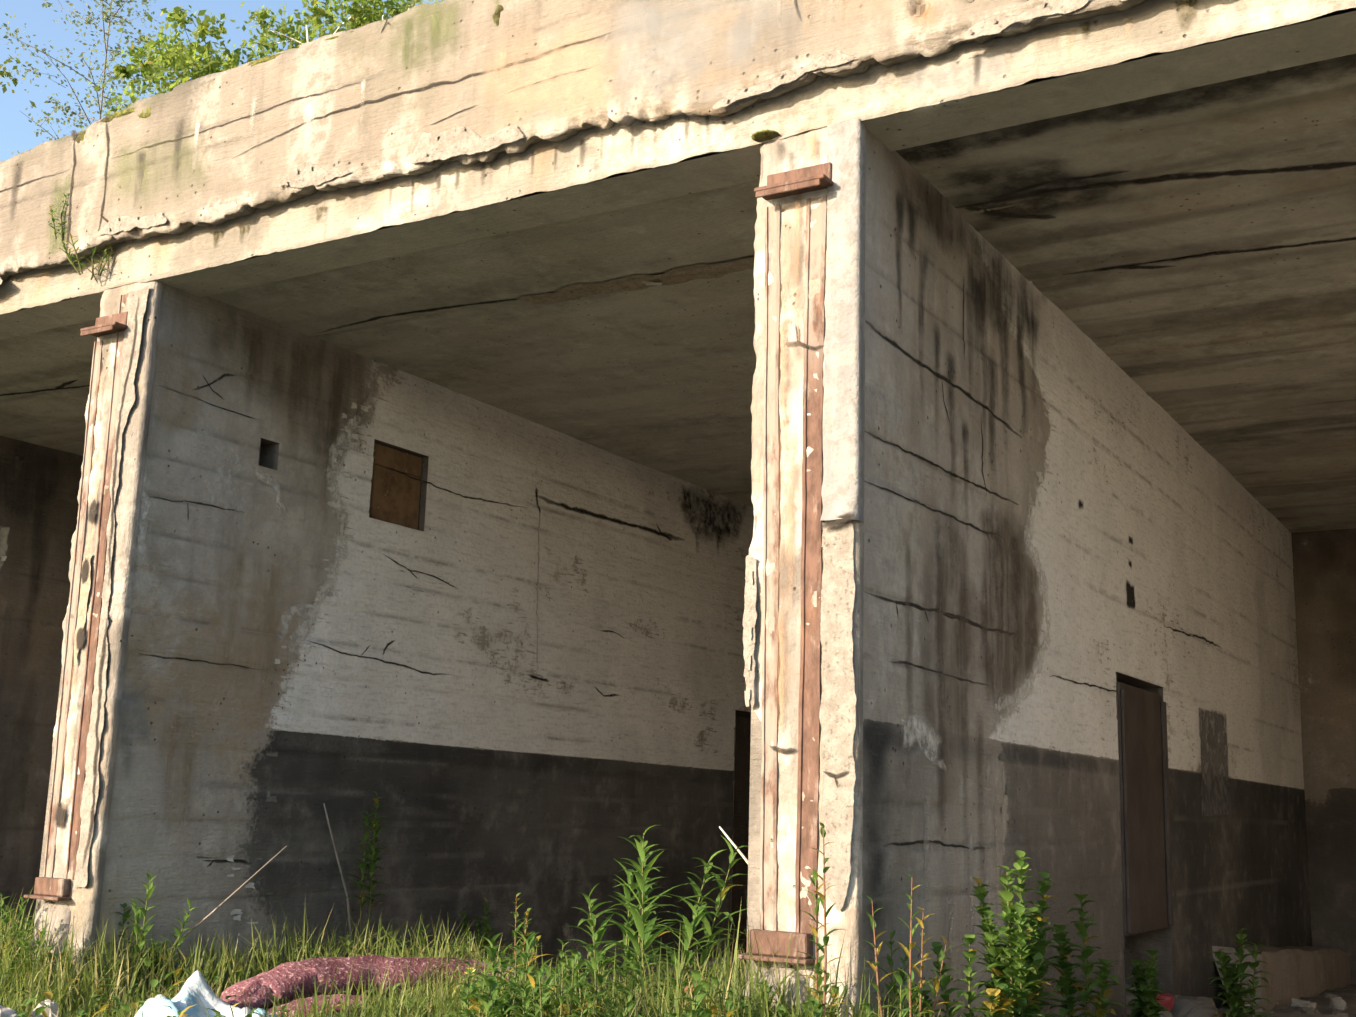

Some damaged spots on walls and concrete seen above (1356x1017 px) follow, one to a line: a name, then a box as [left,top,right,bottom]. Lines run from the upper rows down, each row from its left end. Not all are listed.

spalling [948,0,1089,41]
crack [0,38,595,249]
damp [900,139,965,163]
damp [959,163,1113,220]
damp [982,54,1356,145]
damp [975,257,1034,440]
crack [865,285,1018,504]
peeling [0,527,10,569]
crack [385,467,677,682]
crack [868,482,997,535]
crack [310,641,440,675]
damp [904,506,1050,775]